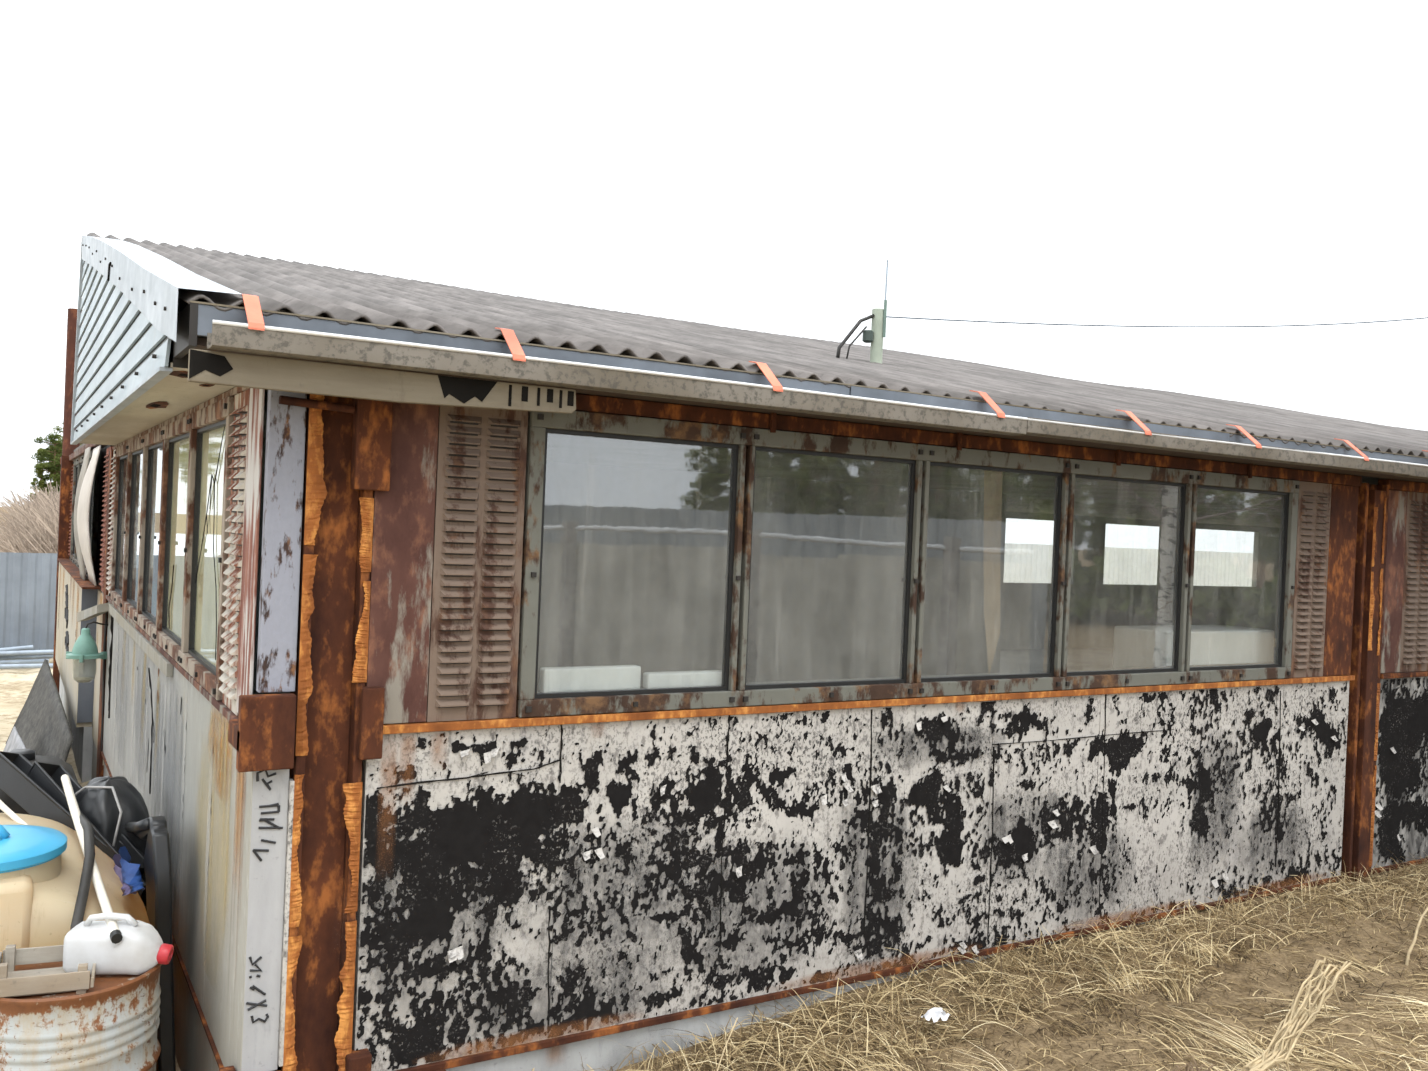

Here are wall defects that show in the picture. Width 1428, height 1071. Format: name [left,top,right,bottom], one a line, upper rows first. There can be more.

rust [295,394,327,756]
rust [352,497,374,683]
rust [1368,498,1387,655]
rust [283,774,305,1071]
rust [334,782,363,1071]
peeling [356,683,1347,1070]
rust [1369,683,1381,867]
peeling [1374,677,1428,867]